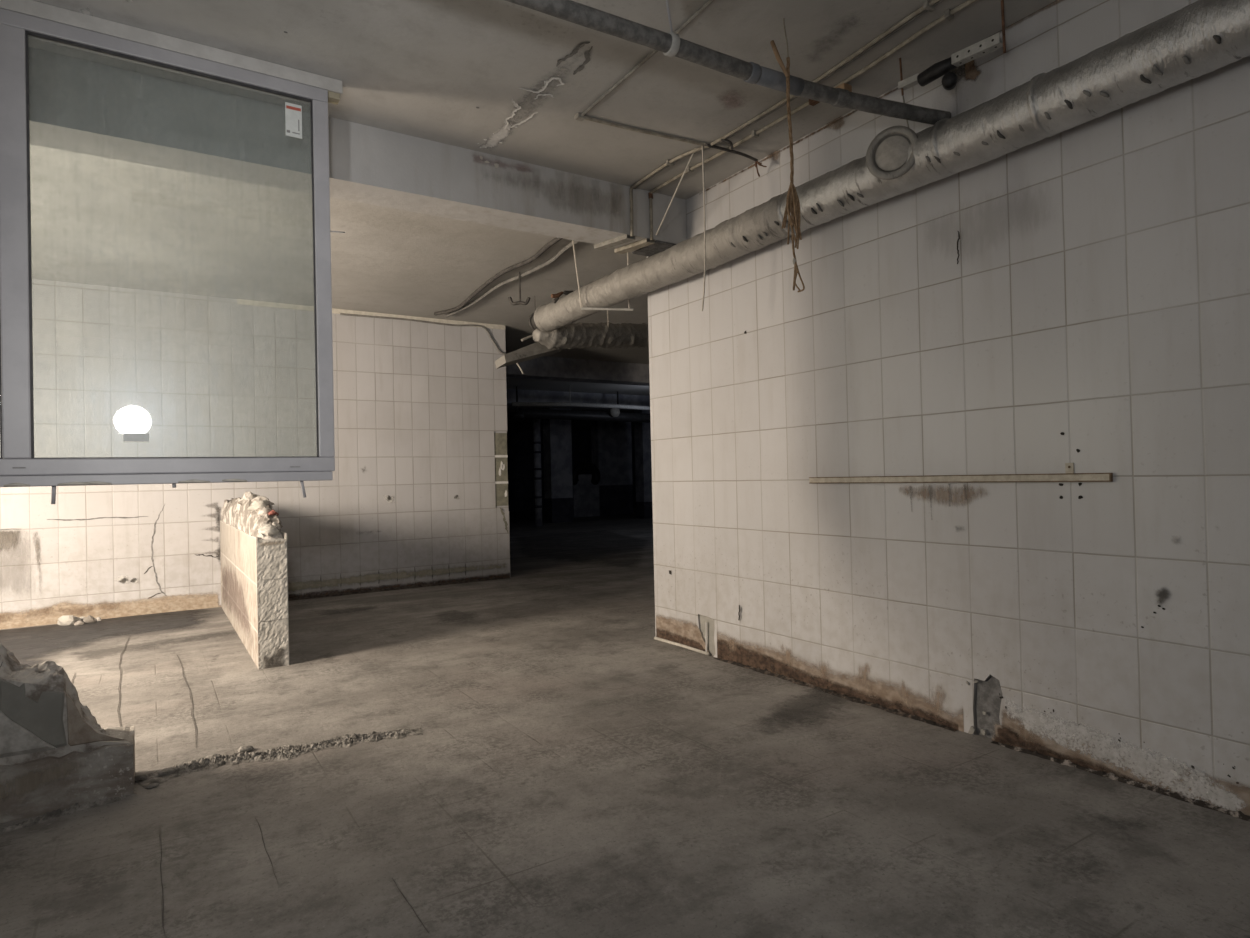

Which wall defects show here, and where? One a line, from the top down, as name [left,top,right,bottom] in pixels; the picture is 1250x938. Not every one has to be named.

crack [477,42,593,148]
leakage [0,528,19,550]
crack [47,505,167,599]
spalling [0,679,124,748]
crack [117,638,129,727]
crack [177,656,197,732]
peeling [966,676,1244,811]